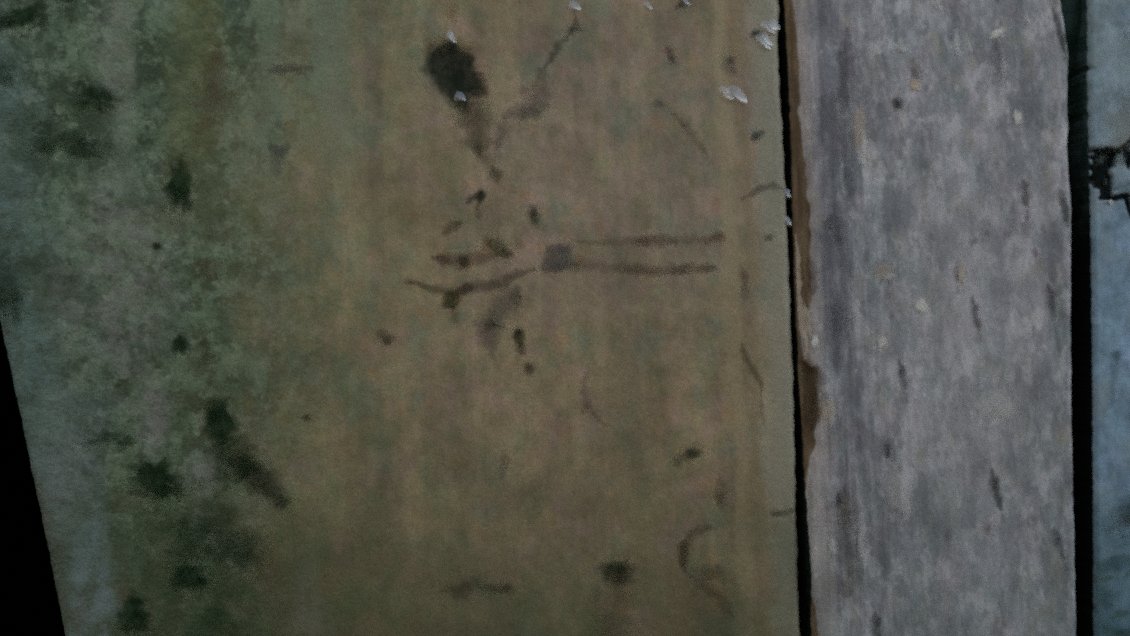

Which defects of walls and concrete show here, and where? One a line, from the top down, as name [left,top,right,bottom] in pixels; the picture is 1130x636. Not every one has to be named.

leakage [428,43,483,108]
crack [1093,139,1130,214]
leakage [205,400,236,440]